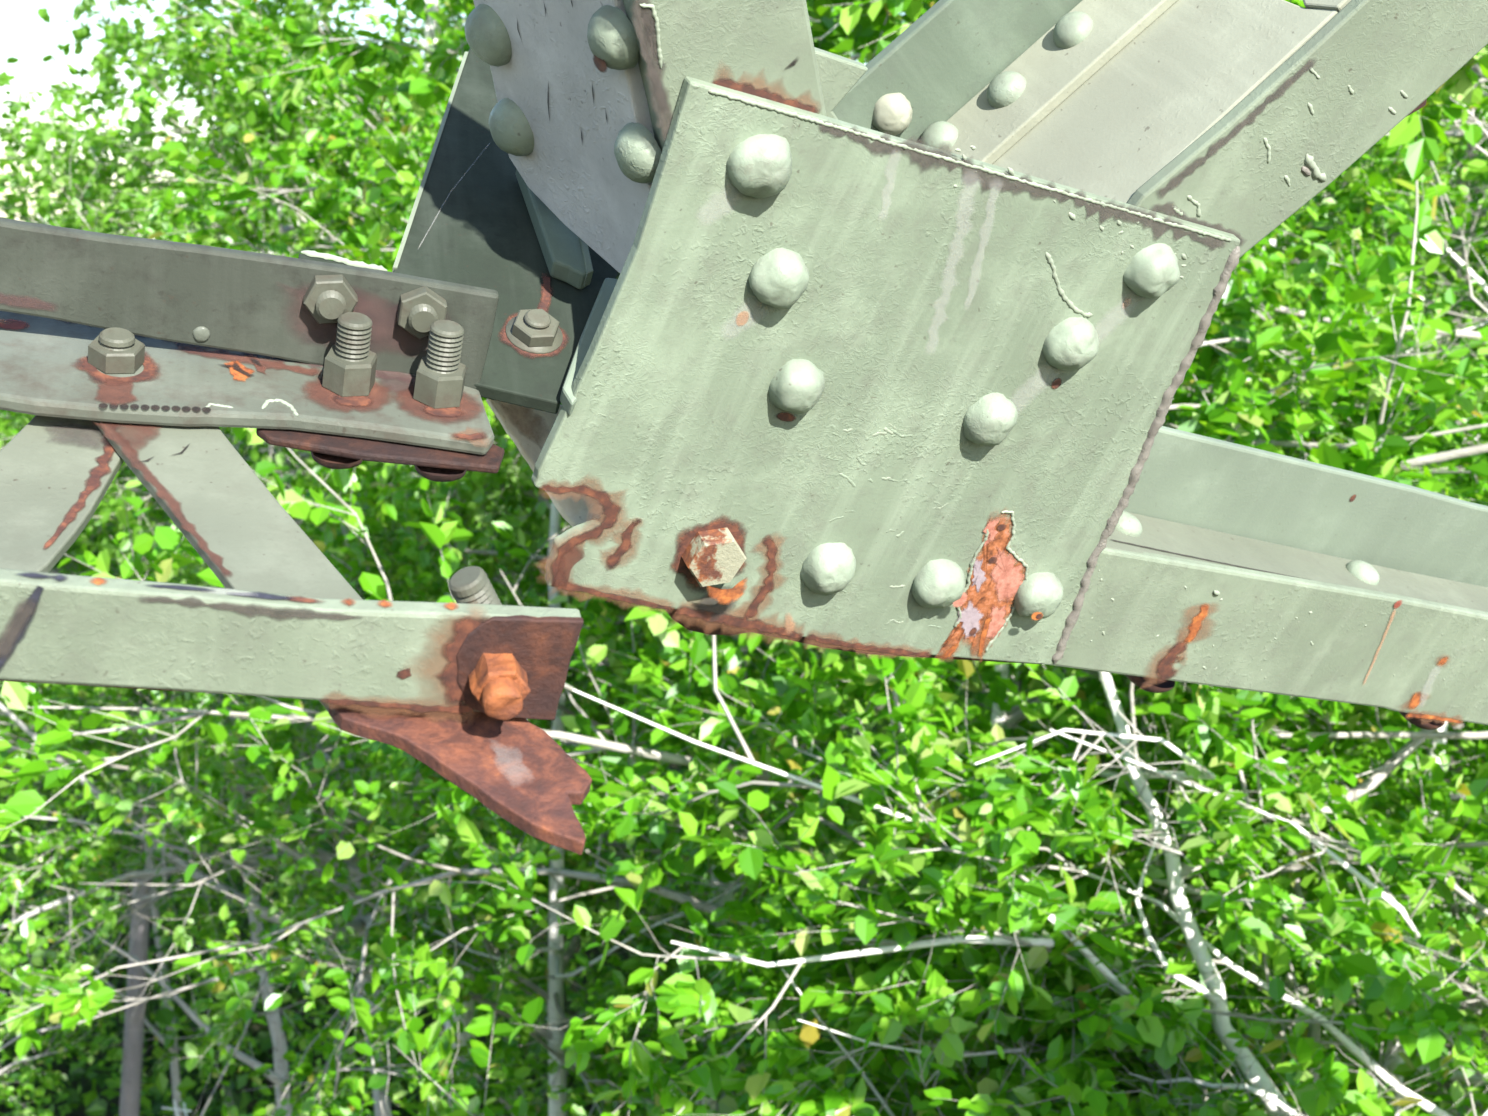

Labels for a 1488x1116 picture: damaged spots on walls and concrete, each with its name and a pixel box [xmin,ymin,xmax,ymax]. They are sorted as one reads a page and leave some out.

rust [76,353,158,404]
rust [176,342,485,440]
rust [44,421,231,575]
rust [324,603,488,714]
rust [542,485,930,656]
peeling [939,510,1028,658]
rust [1157,590,1220,681]